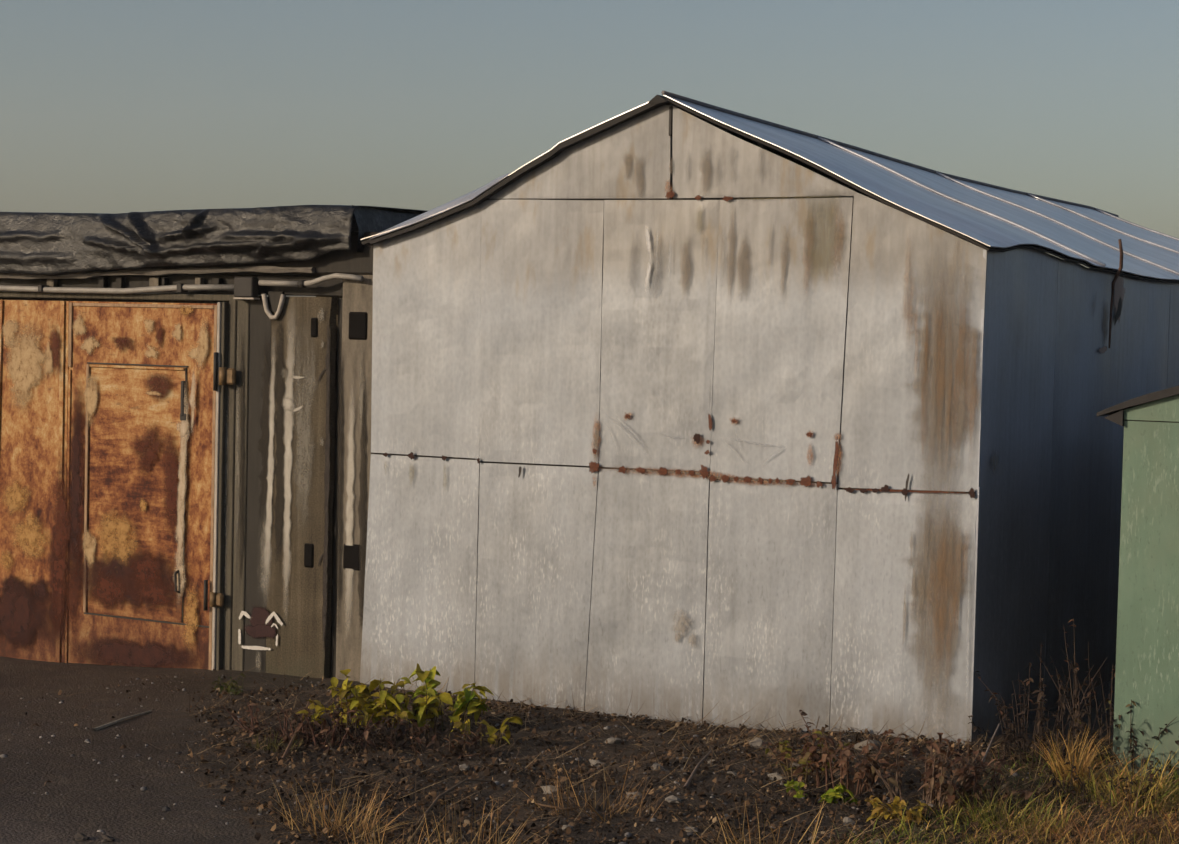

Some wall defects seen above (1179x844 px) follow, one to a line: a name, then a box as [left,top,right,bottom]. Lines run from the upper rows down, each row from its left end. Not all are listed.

rust [0,403,85,647]
rust [49,330,60,371]
water stain [224,344,244,587]
water stain [258,324,315,586]
water stain [336,353,366,627]
rust [589,422,600,485]
rust [618,414,975,498]
rust [82,637,189,668]